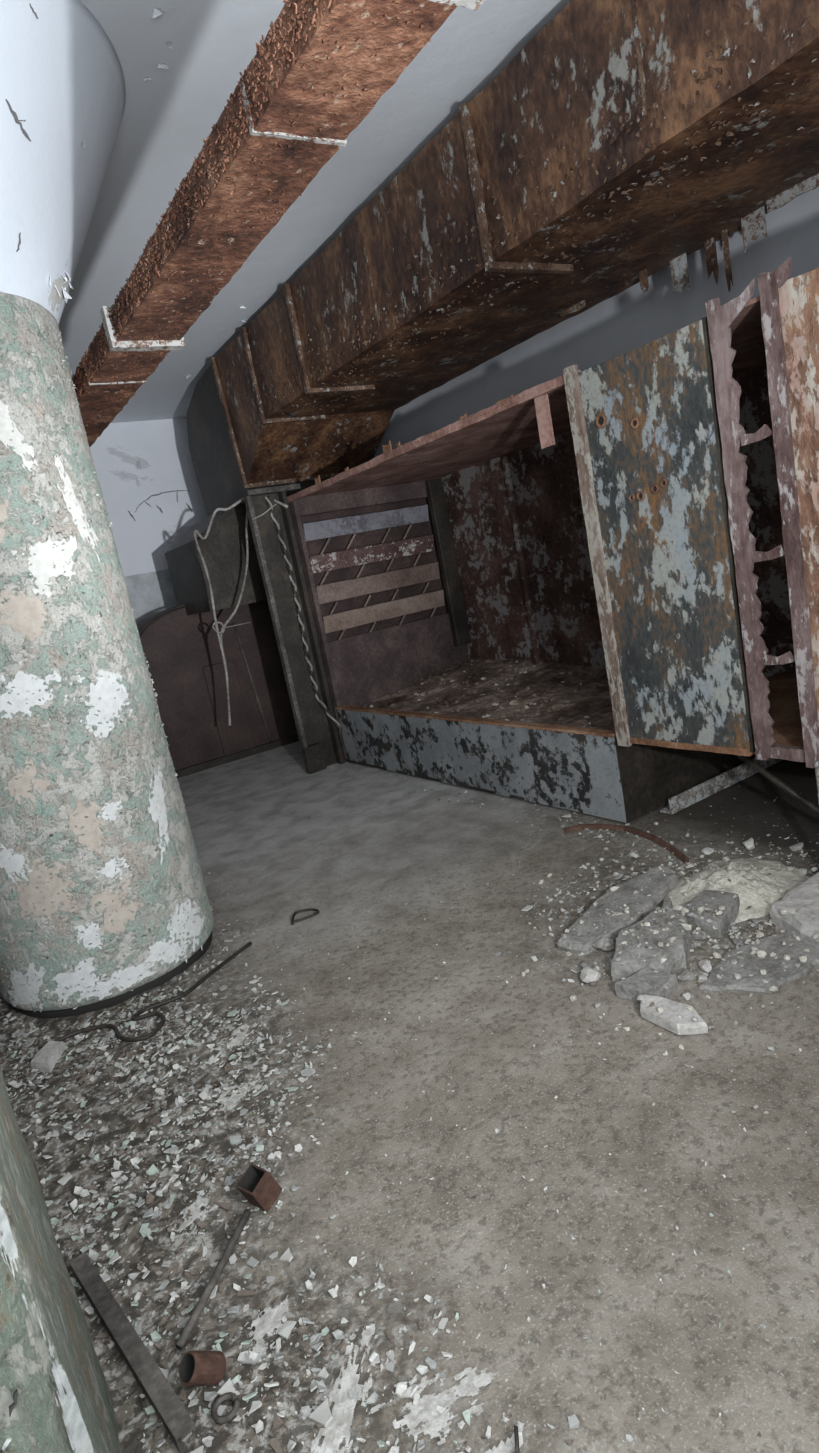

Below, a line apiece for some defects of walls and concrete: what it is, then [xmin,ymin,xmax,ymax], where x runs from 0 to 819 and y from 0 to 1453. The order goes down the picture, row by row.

peeling [0,653,133,738]
peeling [97,797,124,821]
peeling [148,756,169,866]
peeling [0,843,33,885]
peeling [96,855,130,885]